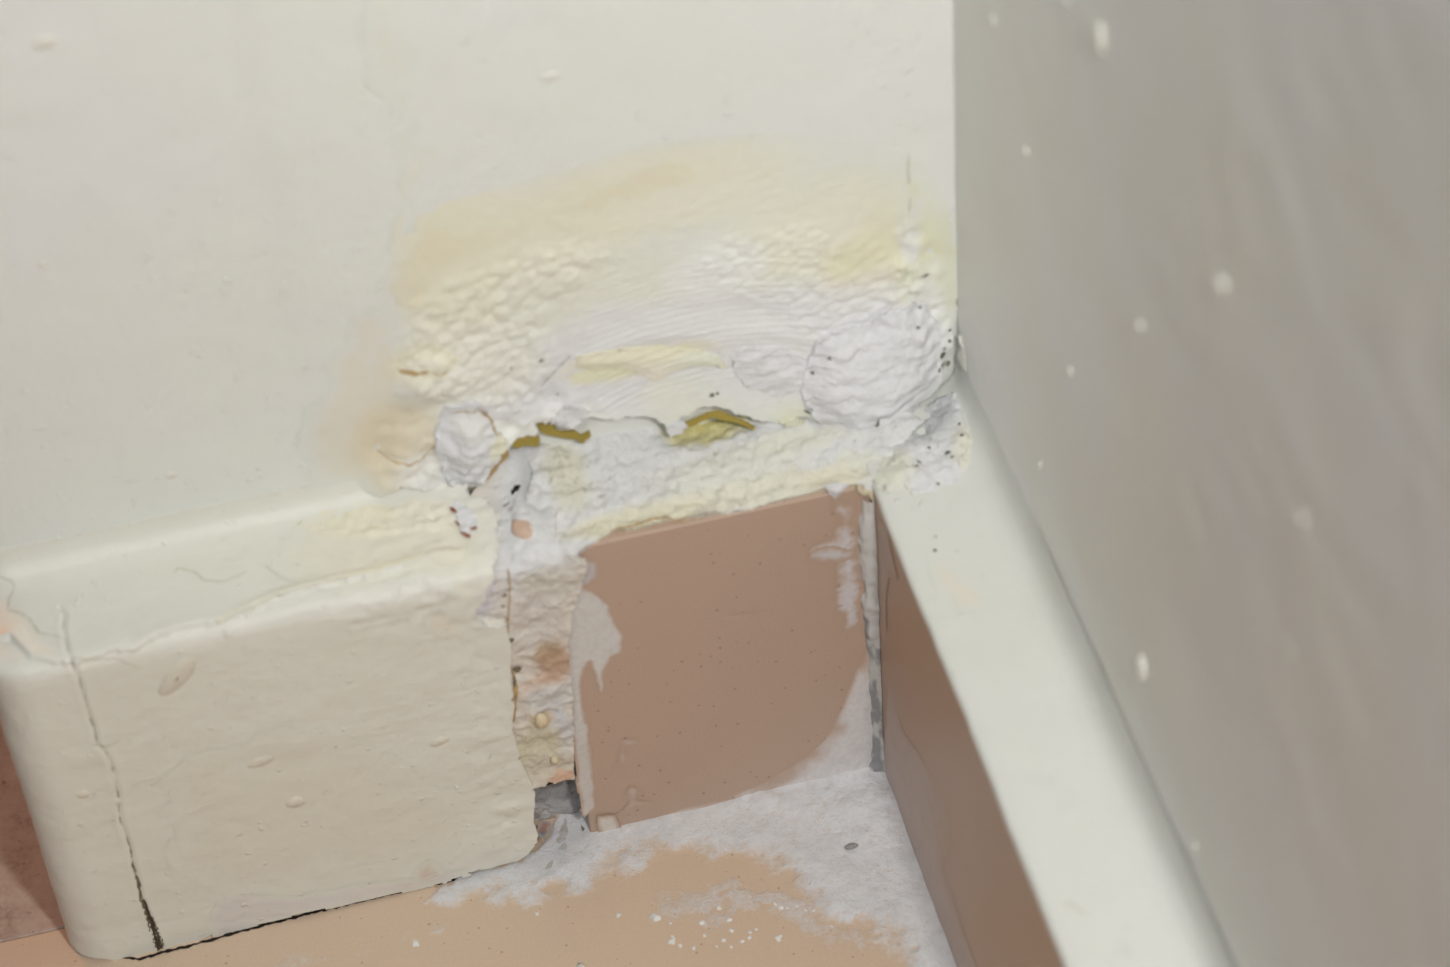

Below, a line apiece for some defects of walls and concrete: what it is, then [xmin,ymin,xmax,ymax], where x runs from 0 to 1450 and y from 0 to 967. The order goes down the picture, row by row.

water stain [262,146,731,640]
peeling [378,132,957,789]
water stain [815,182,953,325]
water stain [872,335,972,497]
crack [0,576,164,951]